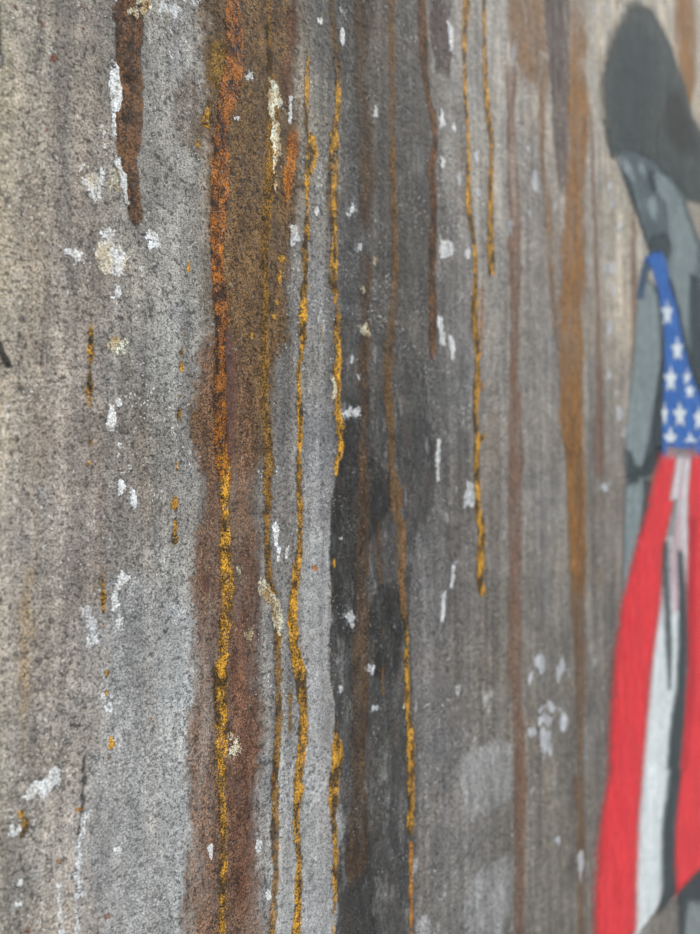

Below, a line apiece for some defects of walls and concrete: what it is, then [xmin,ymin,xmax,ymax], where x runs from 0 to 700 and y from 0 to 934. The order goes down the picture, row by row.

corrosion [113,0,145,225]
corrosion [170,495,179,545]
corrosion [177,0,318,934]
corrosion [329,79,346,476]
damp [279,0,435,934]
corrosion [462,0,495,597]
corrosion [328,724,344,934]